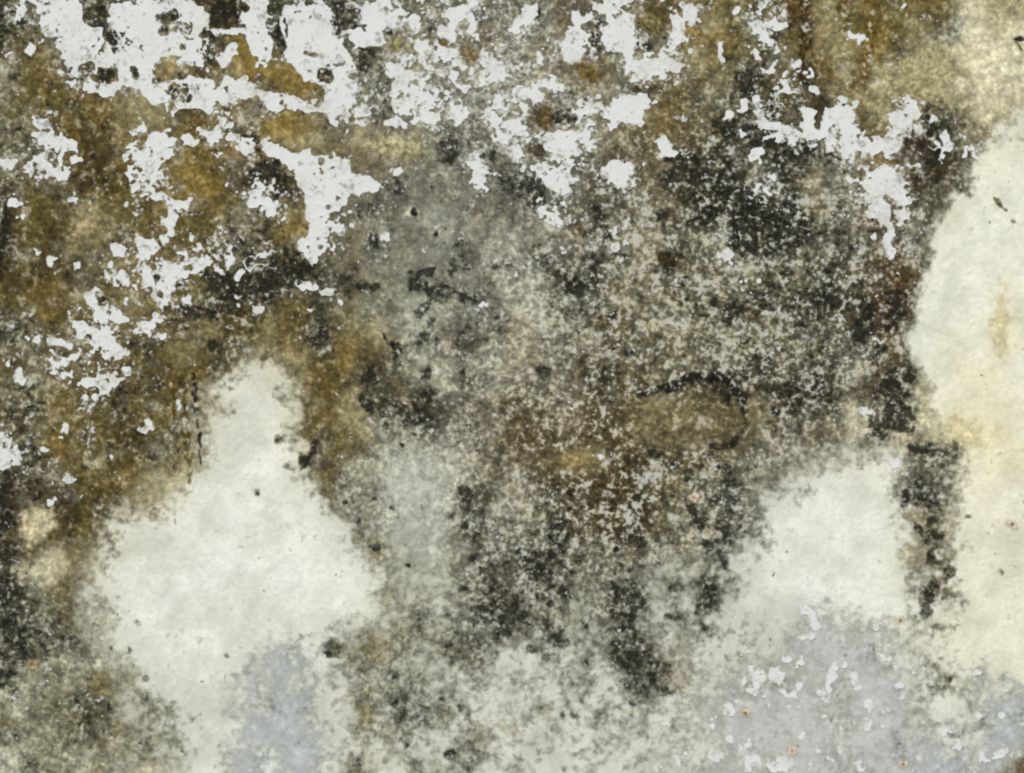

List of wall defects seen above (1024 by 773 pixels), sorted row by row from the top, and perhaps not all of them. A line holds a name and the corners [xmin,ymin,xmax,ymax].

damp [79,0,144,56]
damp [152,0,325,108]
damp [317,60,346,84]
peeling [723,0,985,260]
peeling [0,0,702,408]
peeling [713,240,735,269]
peeling [0,418,24,471]
peeling [137,418,155,434]
mould [898,476,960,620]
mould [322,638,342,658]
mould [439,677,502,773]
peeling [710,650,805,730]